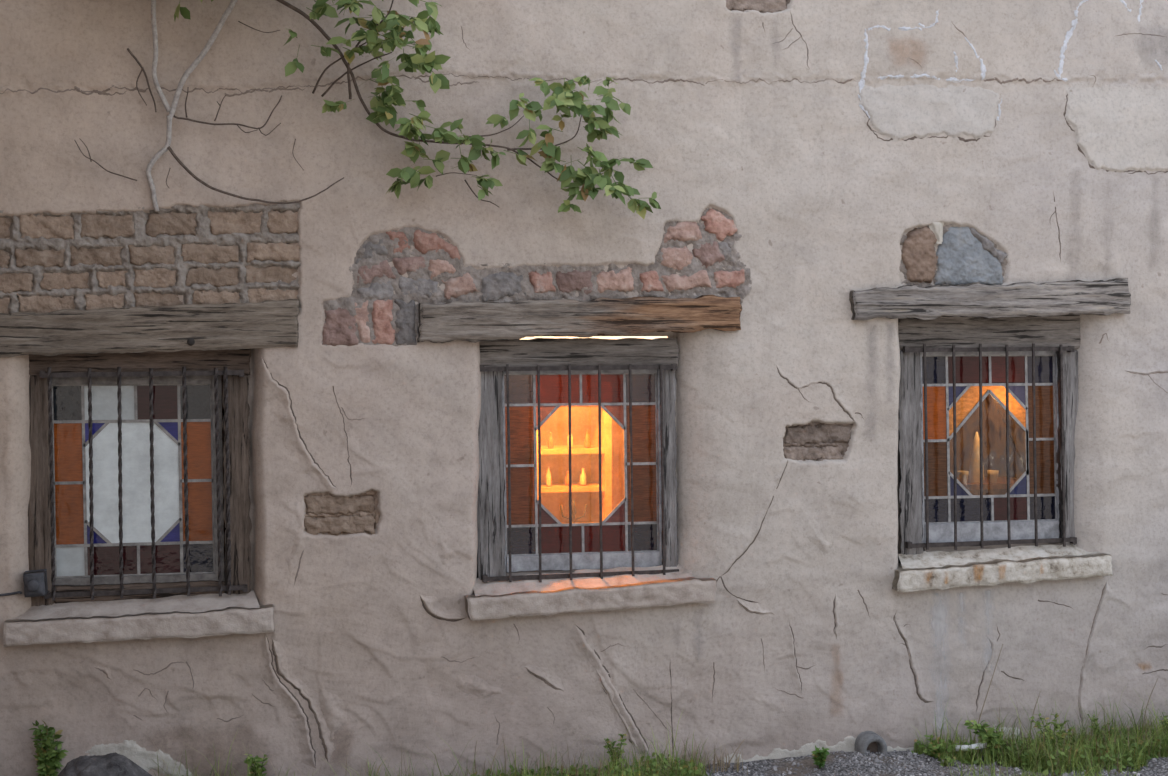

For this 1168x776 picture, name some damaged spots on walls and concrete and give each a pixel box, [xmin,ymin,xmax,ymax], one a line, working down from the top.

flaking render [726,0,790,13]
crack [0,76,369,97]
crack [399,10,1168,174]
flaking render [0,202,303,314]
flaking render [321,207,752,346]
flaking render [899,222,1008,288]
crack [252,357,364,493]
flaking render [783,422,853,461]
flaking render [304,490,380,536]
crack [217,633,336,768]
crack [514,624,674,758]
crack [833,589,934,703]